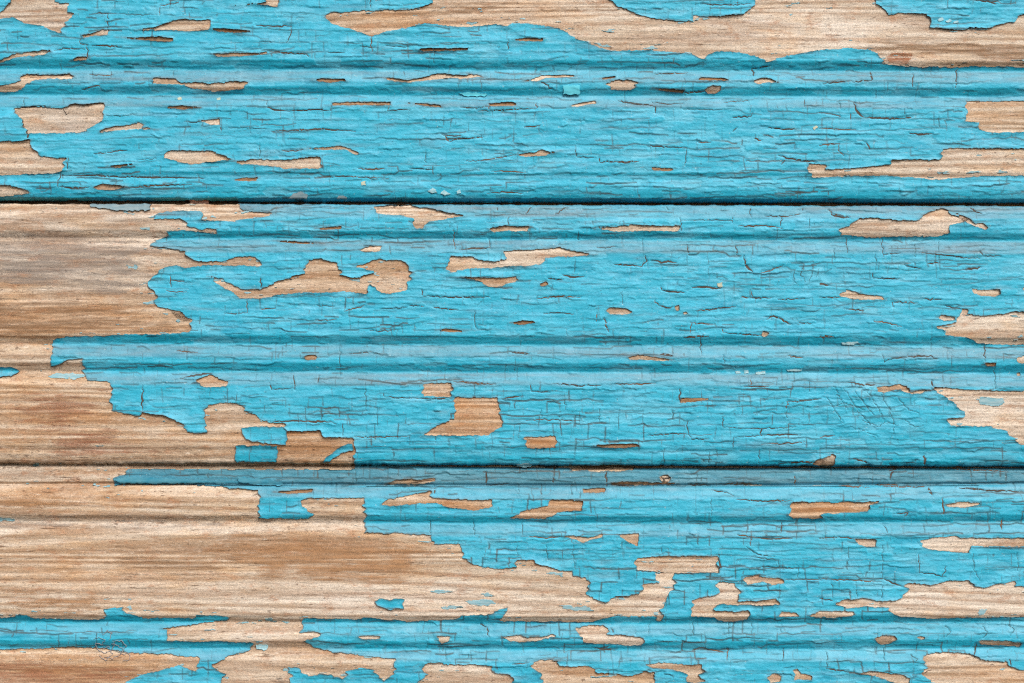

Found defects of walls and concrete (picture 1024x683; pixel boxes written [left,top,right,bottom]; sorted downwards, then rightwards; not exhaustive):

crack [21,2,179,115]
peeling [325,0,1024,68]
crack [621,72,940,165]
crack [57,150,200,189]
peeling [807,148,1024,180]
crack [577,205,849,363]
peeling [0,103,799,683]
crack [267,381,651,438]
peeling [877,384,1024,445]
crack [540,380,1024,601]
peeling [810,580,1024,619]
peeling [922,652,1024,683]